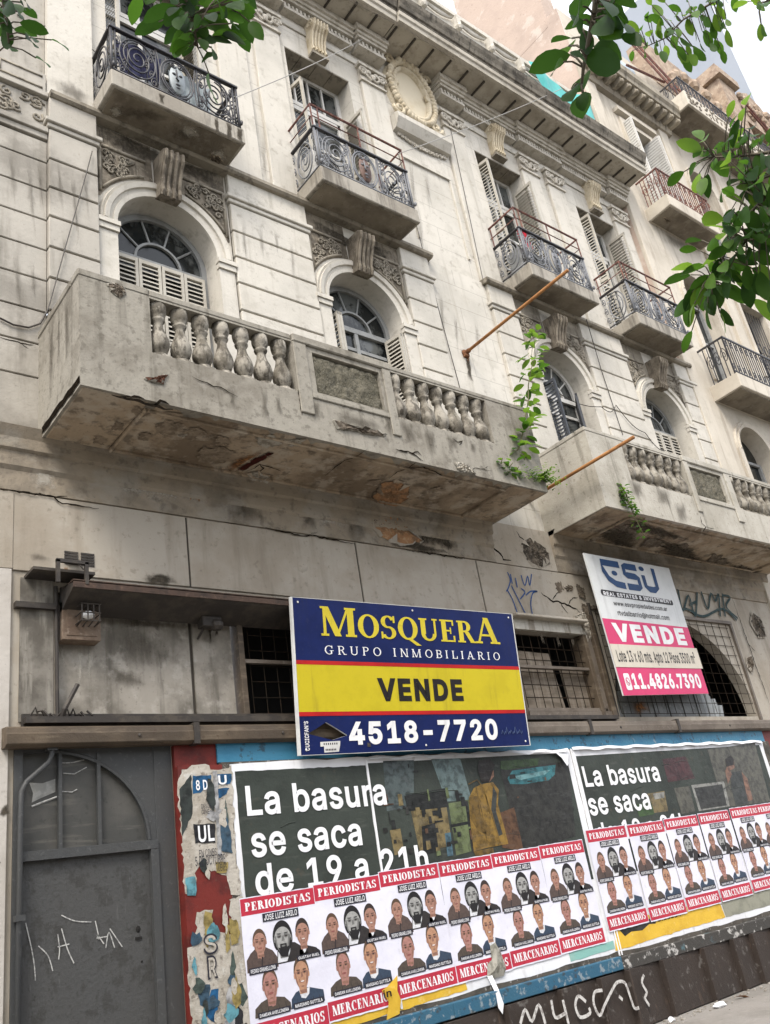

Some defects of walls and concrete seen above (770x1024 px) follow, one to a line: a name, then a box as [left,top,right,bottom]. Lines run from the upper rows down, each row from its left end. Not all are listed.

spalling [144,374,169,385]
crack [111,394,173,410]
spalling [332,419,387,436]
rust [231,453,274,472]
crack [0,489,99,509]
spalling [372,479,424,546]
spalling [519,536,551,569]
crack [542,592,582,613]